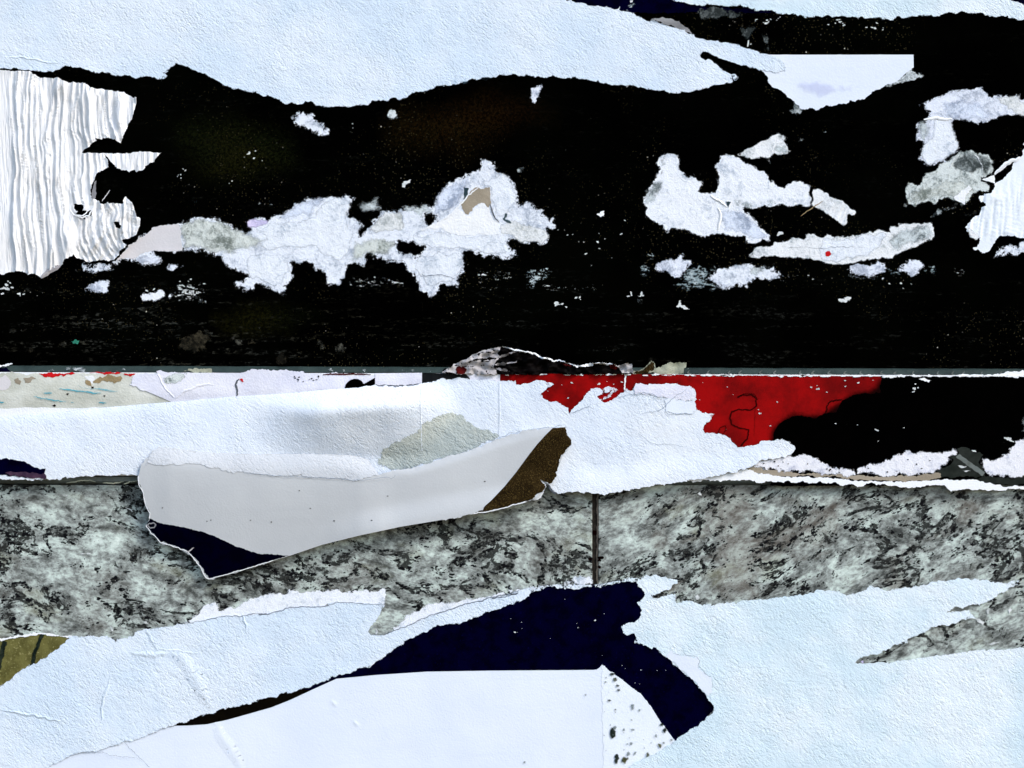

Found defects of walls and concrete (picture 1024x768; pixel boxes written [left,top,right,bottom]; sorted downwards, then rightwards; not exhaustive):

peeling [676,265,716,290]
peeling [569,370,1024,392]
peeling [937,447,1024,486]